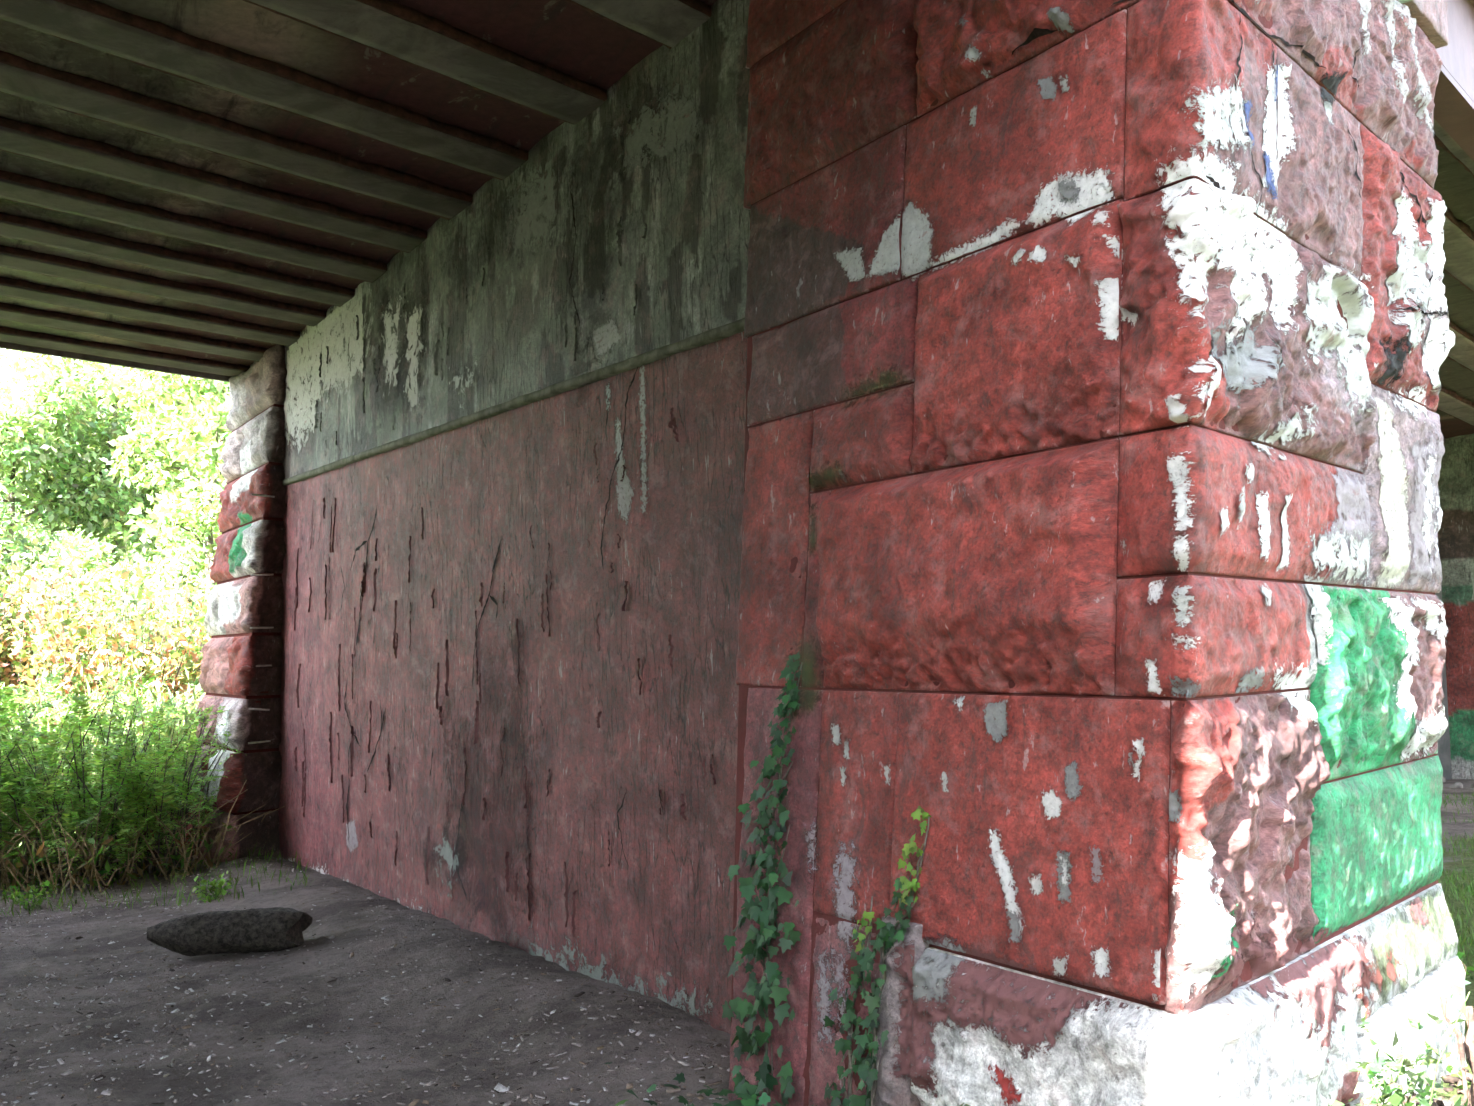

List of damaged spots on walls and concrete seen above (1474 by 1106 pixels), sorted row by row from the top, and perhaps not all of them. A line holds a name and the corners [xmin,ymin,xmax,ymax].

peeling [834,168,1138,342]
peeling [1144,54,1455,764]
crack [341,502,378,645]
crack [472,537,502,685]
crack [344,687,386,840]
crack [456,804,467,899]
crack [617,784,664,866]
peeling [830,723,851,787]
peeling [982,699,1009,744]
peeling [890,827,1401,1106]
peeling [1161,786,1184,823]
peeling [1402,877,1431,927]